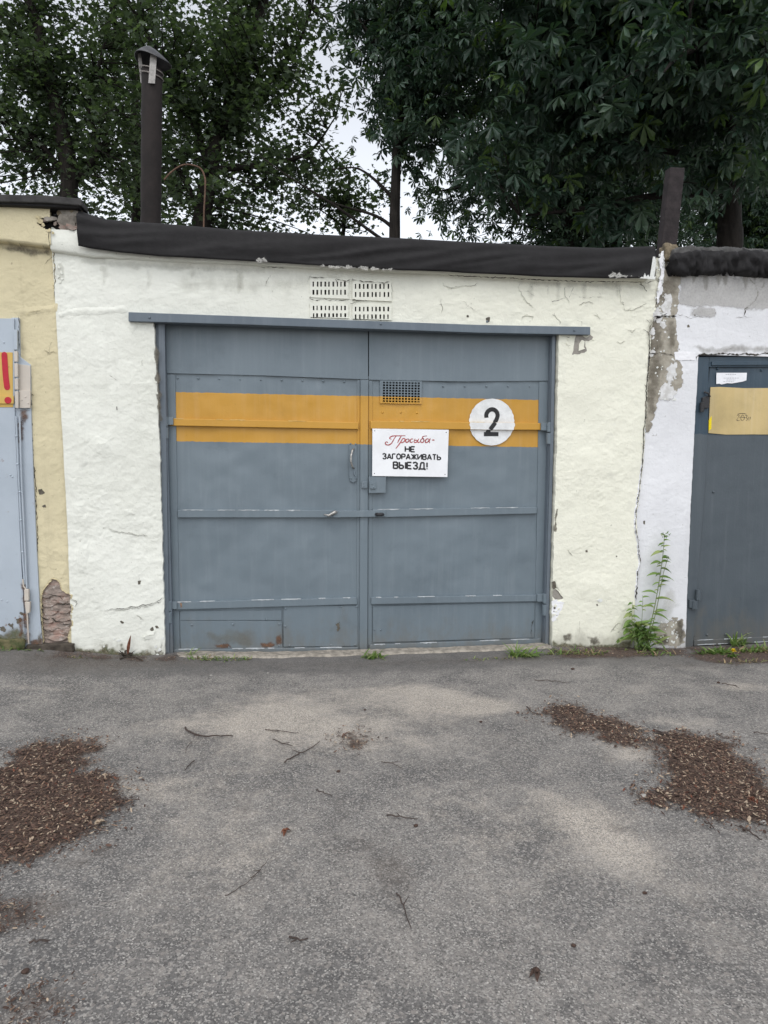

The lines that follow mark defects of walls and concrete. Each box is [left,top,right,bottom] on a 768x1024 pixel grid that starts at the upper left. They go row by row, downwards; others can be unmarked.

peeling [566,335,595,355]
peeling [640,243,696,432]
crack [441,275,768,600]
spalling [34,578,139,661]
peeling [542,617,768,666]